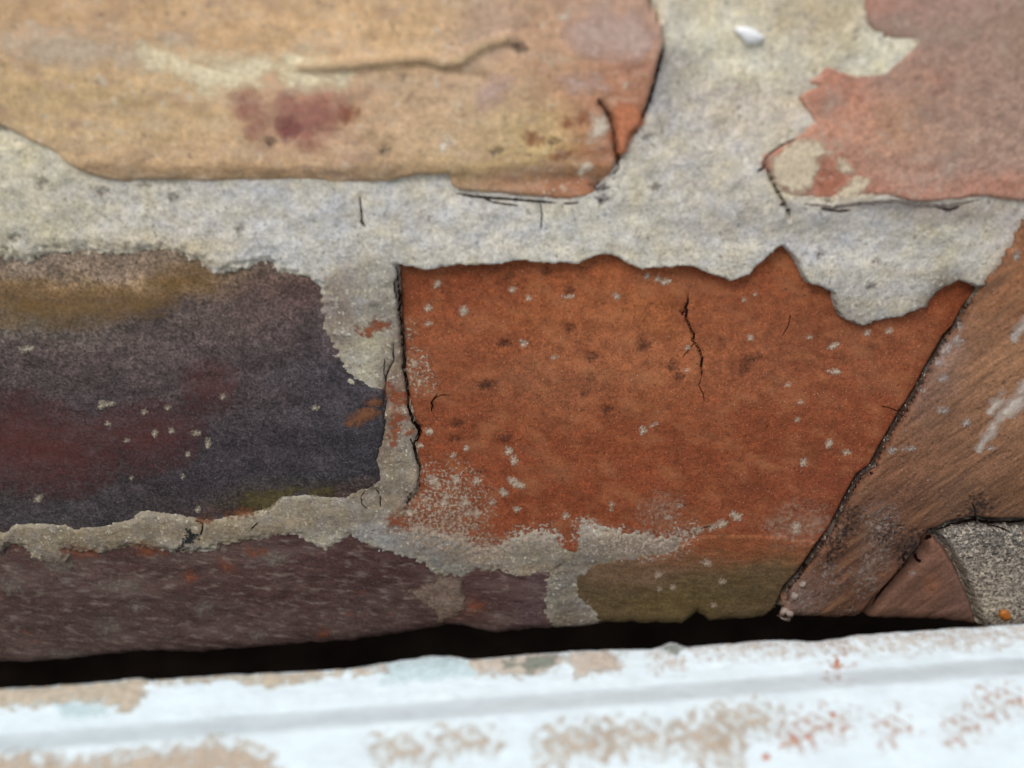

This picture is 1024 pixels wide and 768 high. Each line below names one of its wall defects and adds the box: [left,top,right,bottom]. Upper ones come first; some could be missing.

crack [757,138,979,219]
crack [382,266,449,505]
crack [681,294,704,398]
peeling [0,651,623,714]